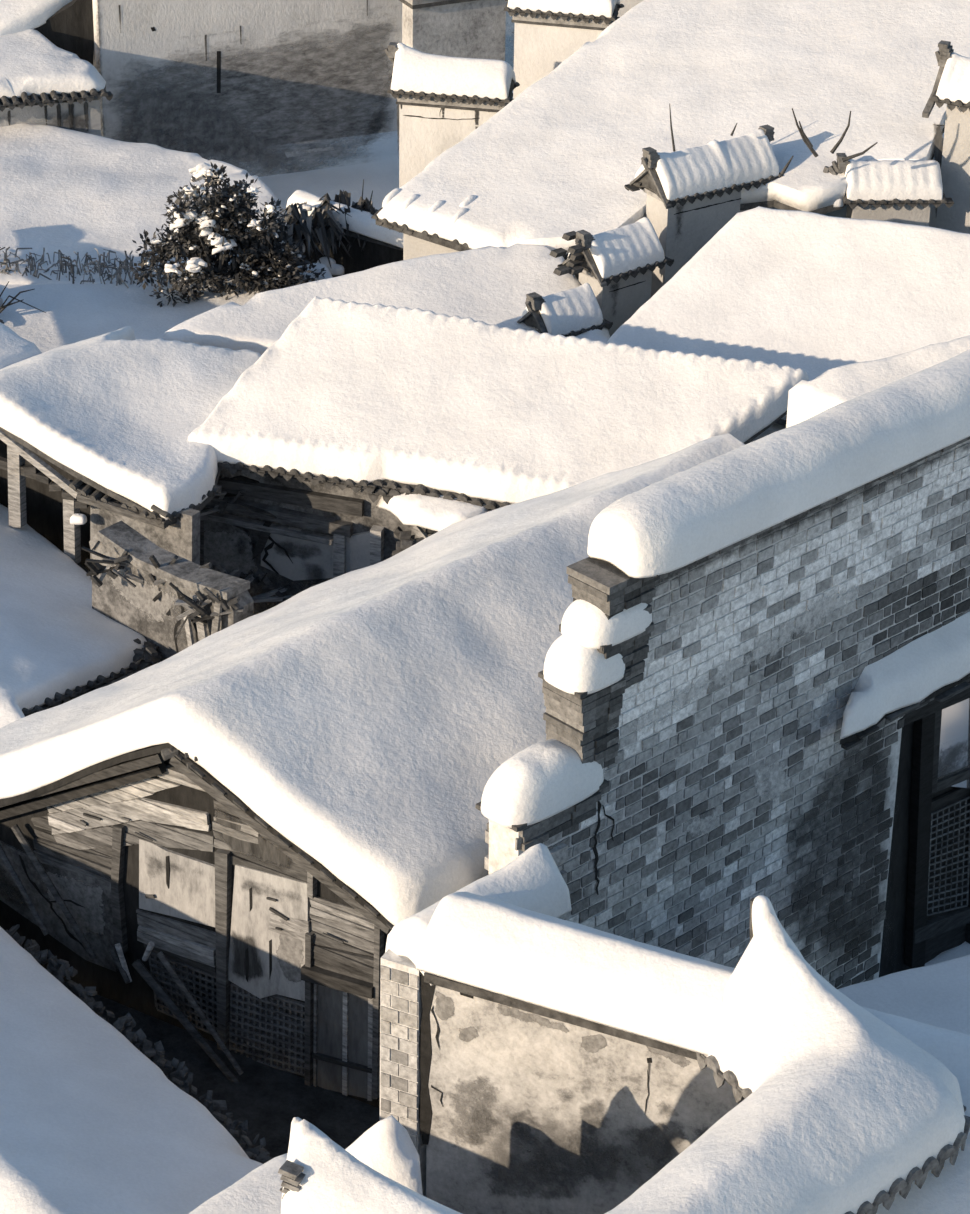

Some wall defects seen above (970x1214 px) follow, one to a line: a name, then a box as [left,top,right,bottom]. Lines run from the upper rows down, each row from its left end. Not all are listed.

water stain [366,104,402,143]
crack [593,801,615,895]
crack [19,855,87,952]
crack [419,974,443,1145]
water stain [450,1078,708,1198]
crack [643,1070,651,1112]